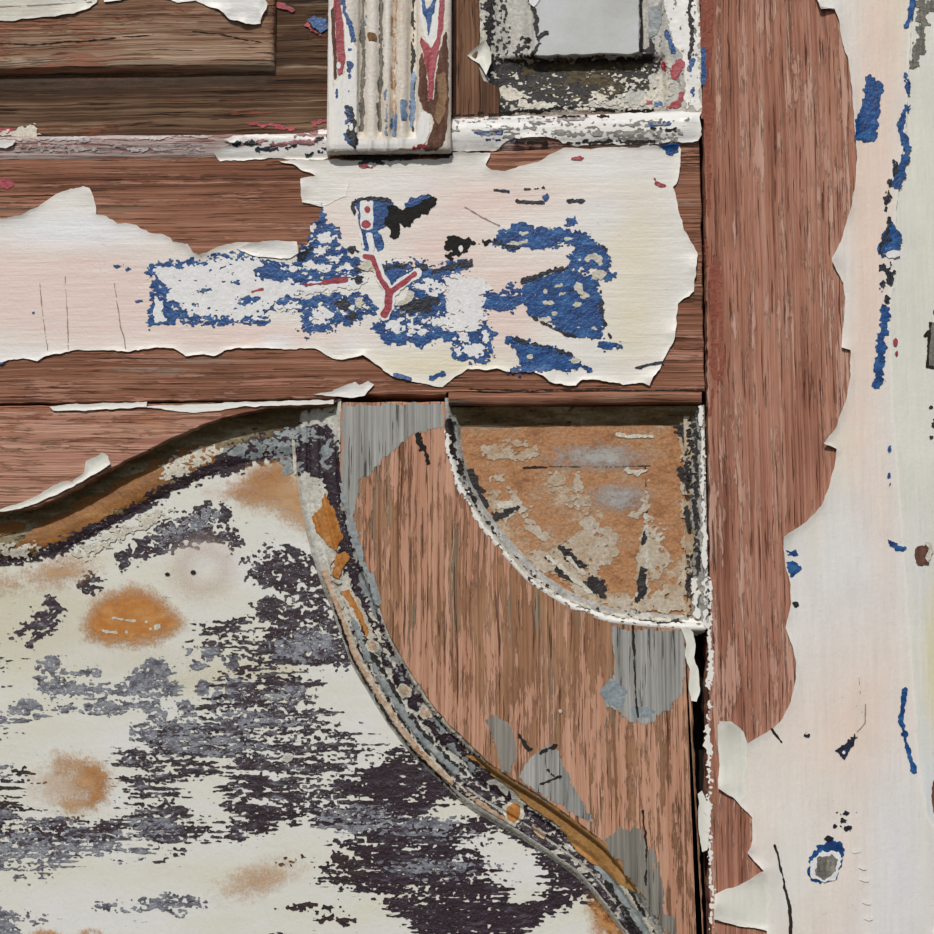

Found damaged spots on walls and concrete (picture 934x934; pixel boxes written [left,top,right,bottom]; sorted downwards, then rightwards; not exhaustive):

peeling [0,0,702,387]
peeling [0,453,110,512]
corrosion [84,587,181,646]
corrosion [235,462,380,653]
peeling [50,381,714,725]
peeling [698,0,934,934]
peeling [485,715,593,822]
peeling [602,825,677,934]